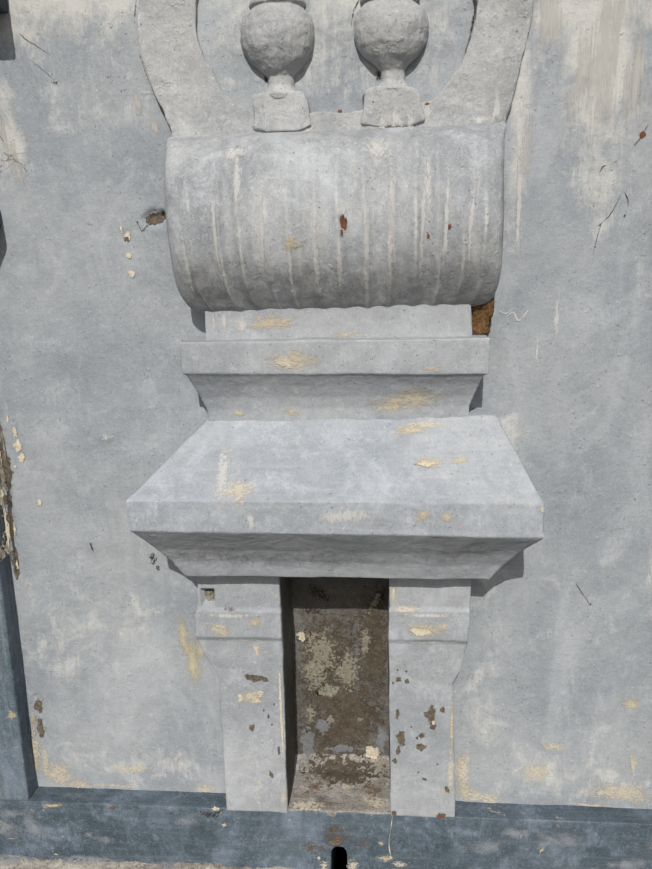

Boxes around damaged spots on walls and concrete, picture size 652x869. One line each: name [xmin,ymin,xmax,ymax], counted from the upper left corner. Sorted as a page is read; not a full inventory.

flaking render [120,211,166,259]
flaking render [0,415,26,580]
peeling [238,665,284,763]
peeling [295,581,506,803]
peeling [280,788,324,811]